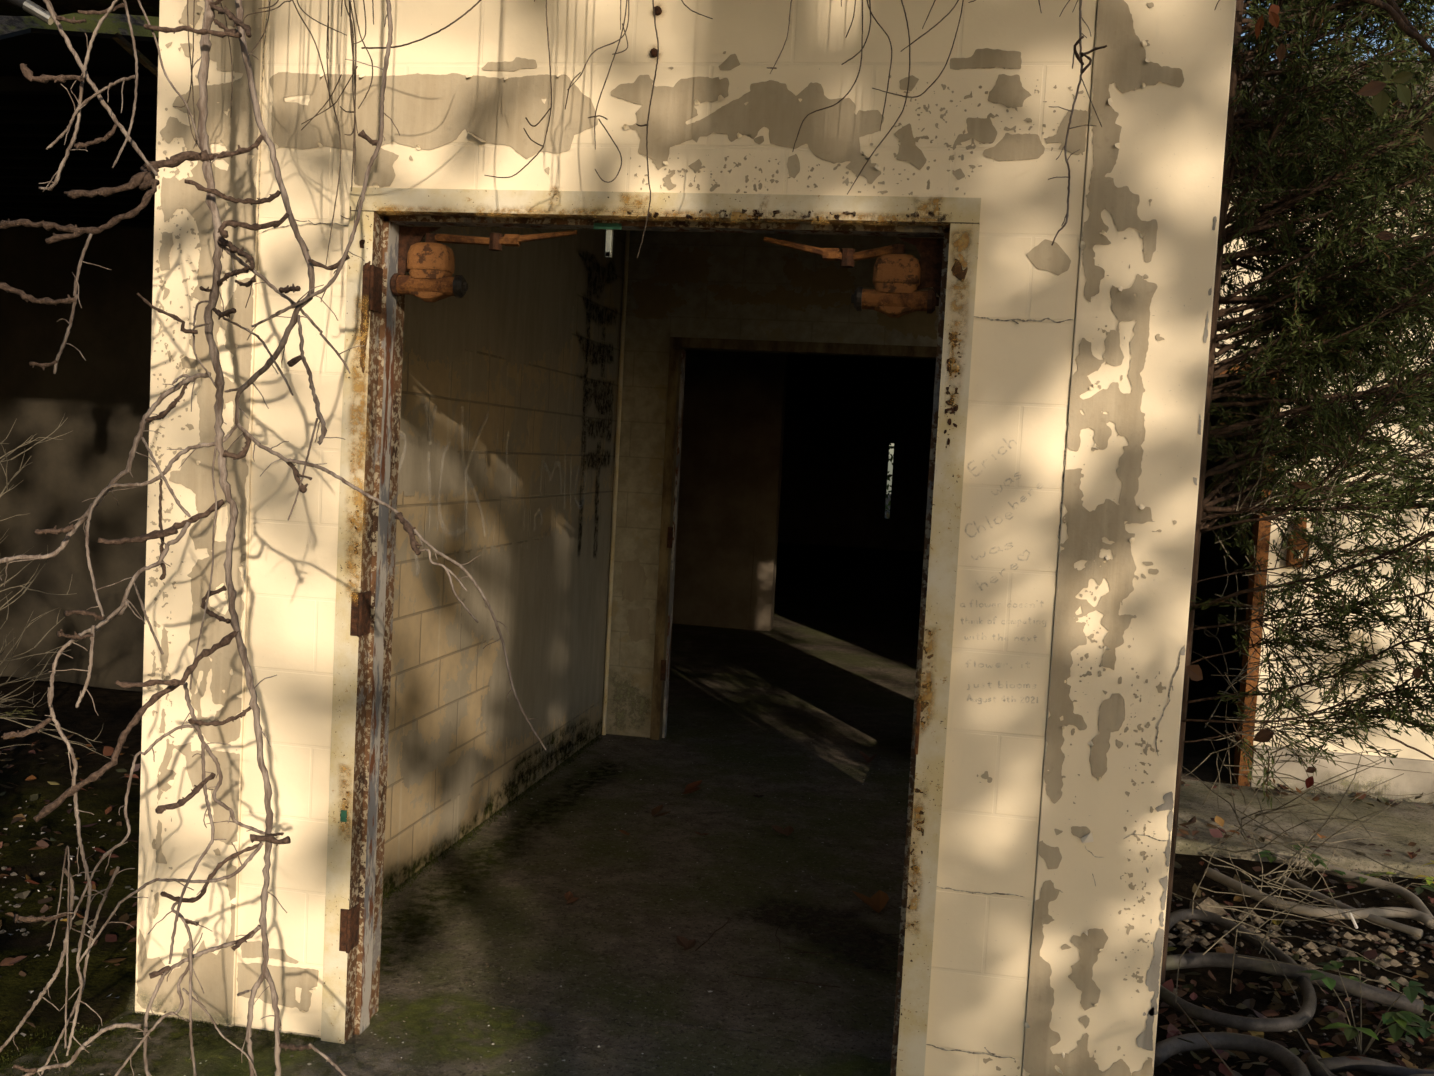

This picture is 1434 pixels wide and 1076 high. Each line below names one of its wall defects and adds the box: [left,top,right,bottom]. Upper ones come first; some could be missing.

corrosion [479,187,970,448]
corrosion [347,298,370,600]
corrosion [919,629,934,730]
corrosion [340,766,350,832]
corrosion [906,788,926,930]